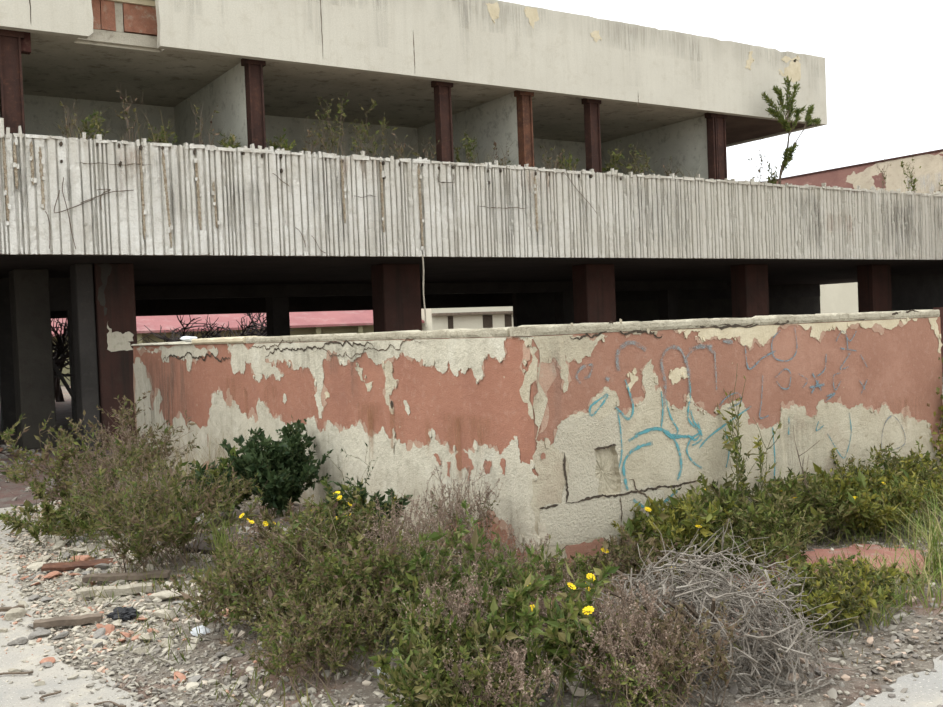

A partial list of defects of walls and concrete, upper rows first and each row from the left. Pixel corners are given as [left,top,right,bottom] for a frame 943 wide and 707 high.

peeling [846,152,943,194]
peeling [97,263,943,576]
crack [540,453,696,521]